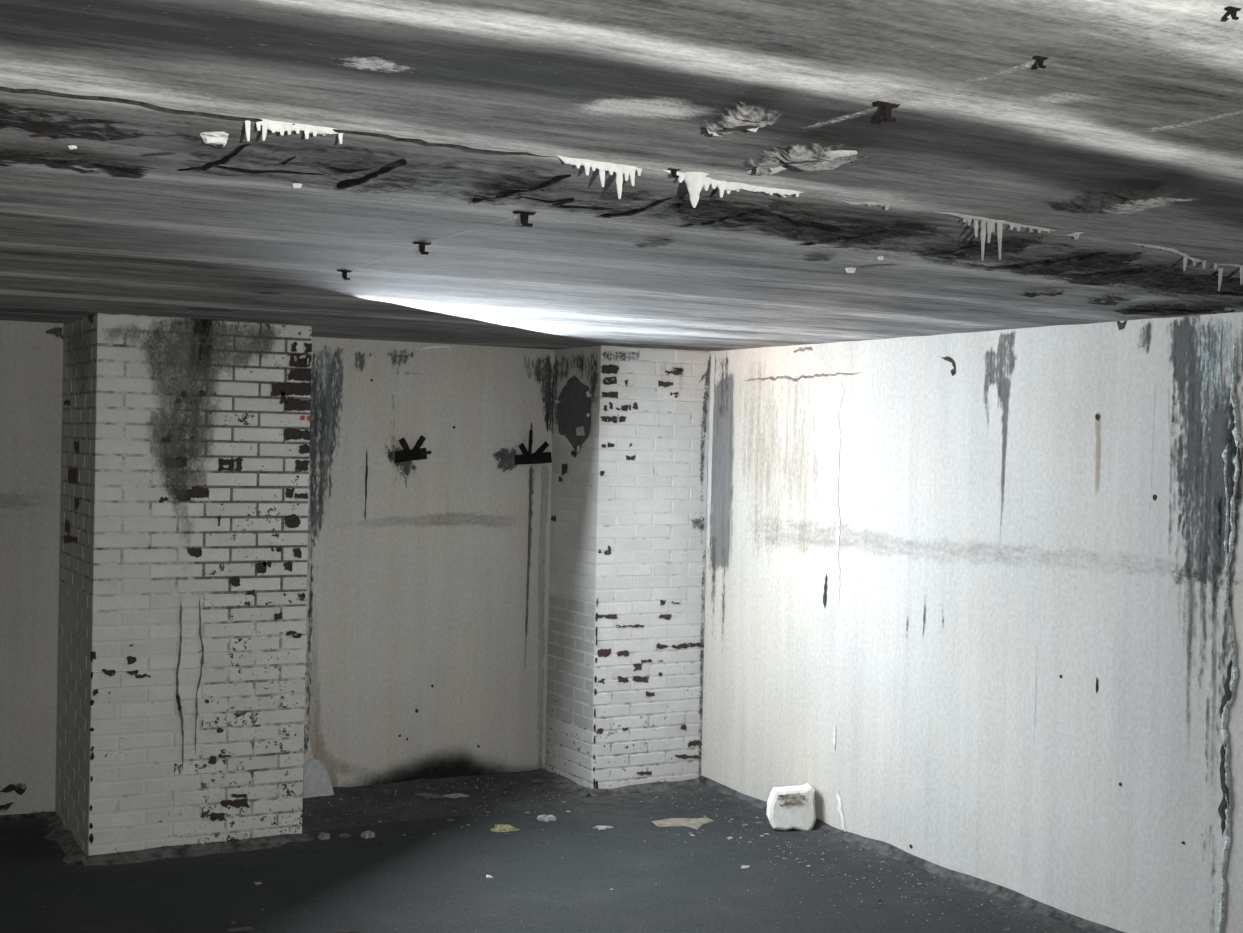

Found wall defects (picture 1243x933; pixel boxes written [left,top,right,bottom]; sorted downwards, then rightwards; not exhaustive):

spalling [0,104,175,178]
water stain [557,155,642,199]
spalling [171,132,1243,330]
water stain [664,170,804,208]
spalling [705,108,777,136]
water stain [934,211,1085,261]
water stain [984,332,1015,510]
water stain [304,347,371,753]
water stain [1168,316,1243,780]
crack [176,597,204,772]
peeling [593,598,704,789]
peeling [208,792,250,824]